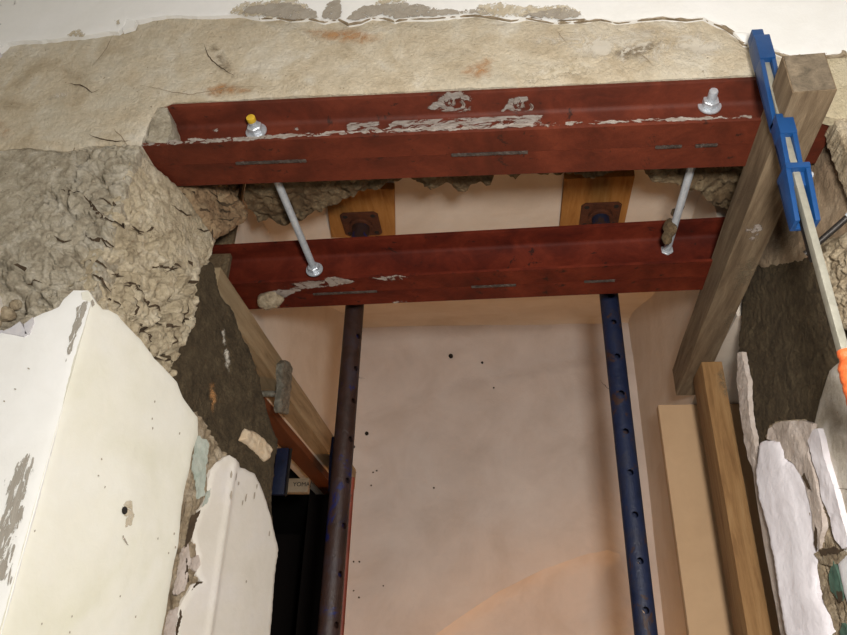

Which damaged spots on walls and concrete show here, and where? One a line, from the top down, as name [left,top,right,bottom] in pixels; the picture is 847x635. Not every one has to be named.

crack [142,45,256,95]
flaking render [231,0,750,47]
flaking render [826,50,847,59]
spalling [644,166,744,211]
spalling [825,118,847,196]
spalling [0,144,494,377]
spalling [820,232,847,331]
flaking render [737,352,760,475]
peeling [0,453,34,586]